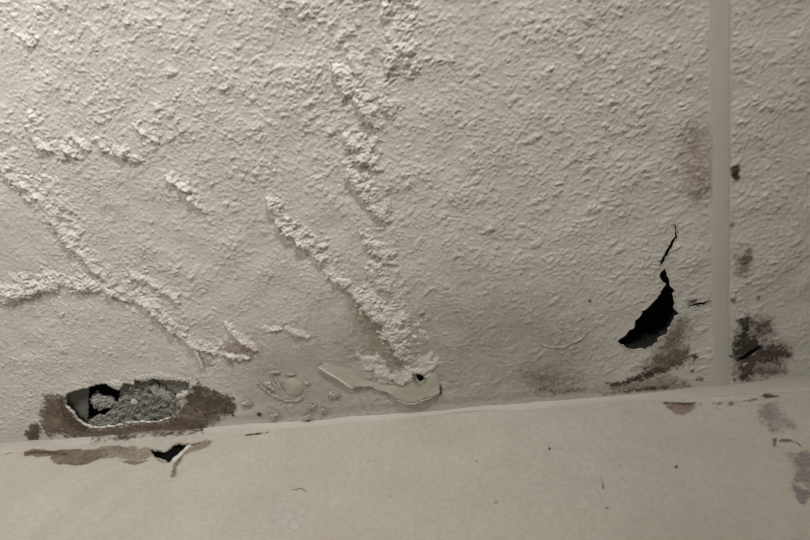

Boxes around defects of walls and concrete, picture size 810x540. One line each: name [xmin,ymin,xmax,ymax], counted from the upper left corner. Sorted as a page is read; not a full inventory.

crack [659,222,678,265]
crack [688,299,713,308]
water stain [597,318,703,394]
water stain [730,317,792,381]
spalling [64,372,190,429]
peeling [319,362,442,405]
spalling [148,443,191,463]